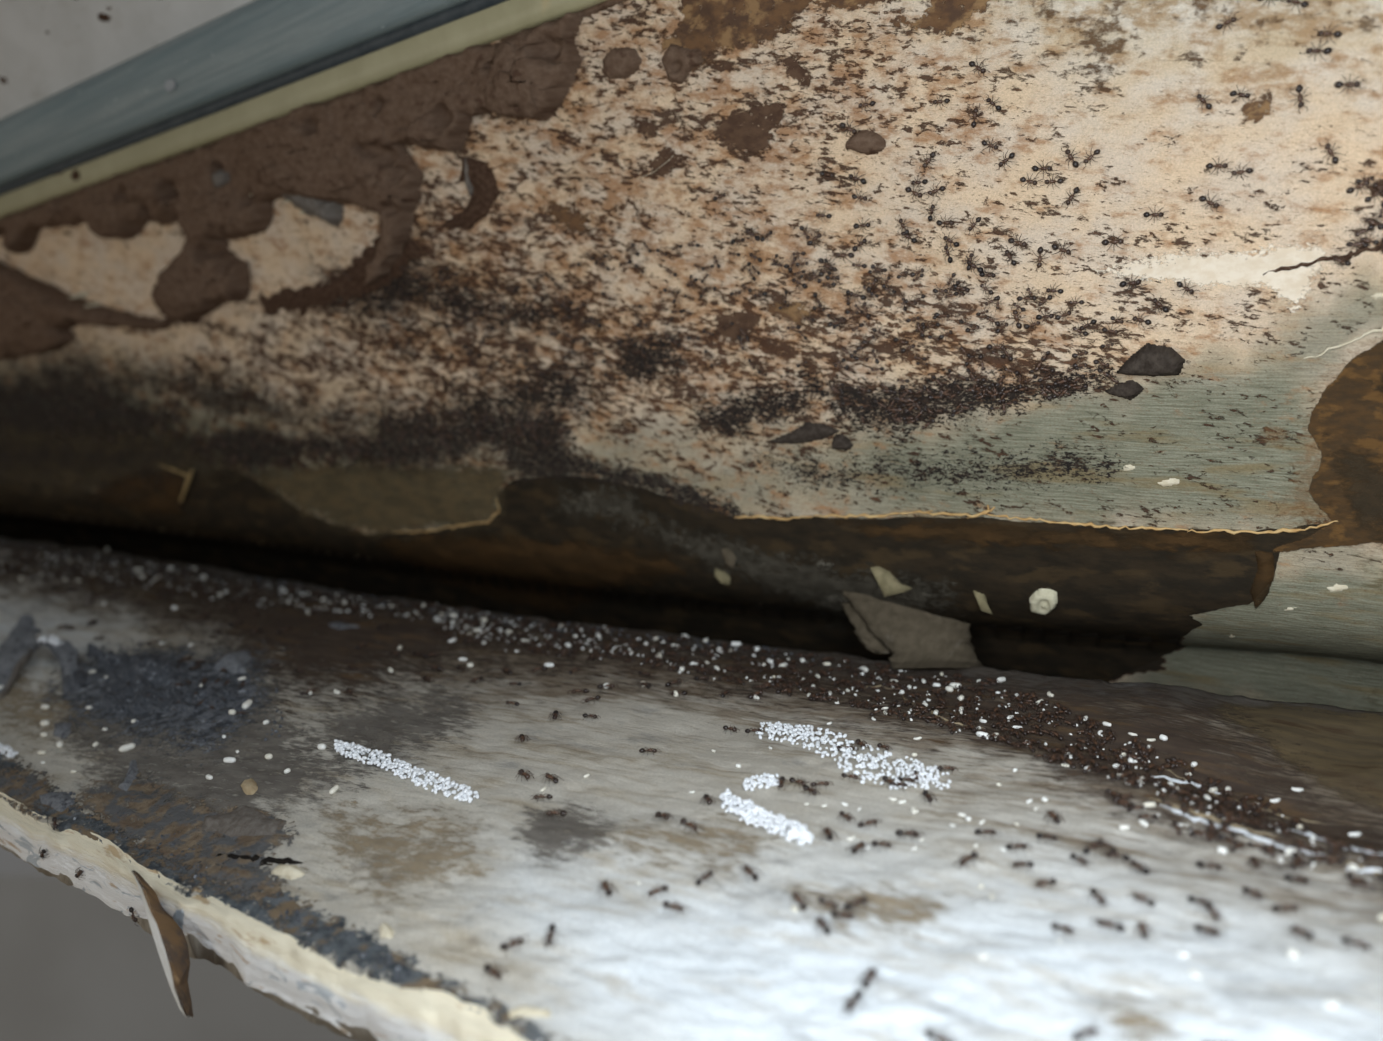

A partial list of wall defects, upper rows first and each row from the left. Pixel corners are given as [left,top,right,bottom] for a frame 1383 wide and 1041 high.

crack [1263,244,1383,276]
water stain [715,298,812,342]
water stain [1273,340,1383,552]
water stain [245,458,507,536]
peeling [0,465,1383,1041]